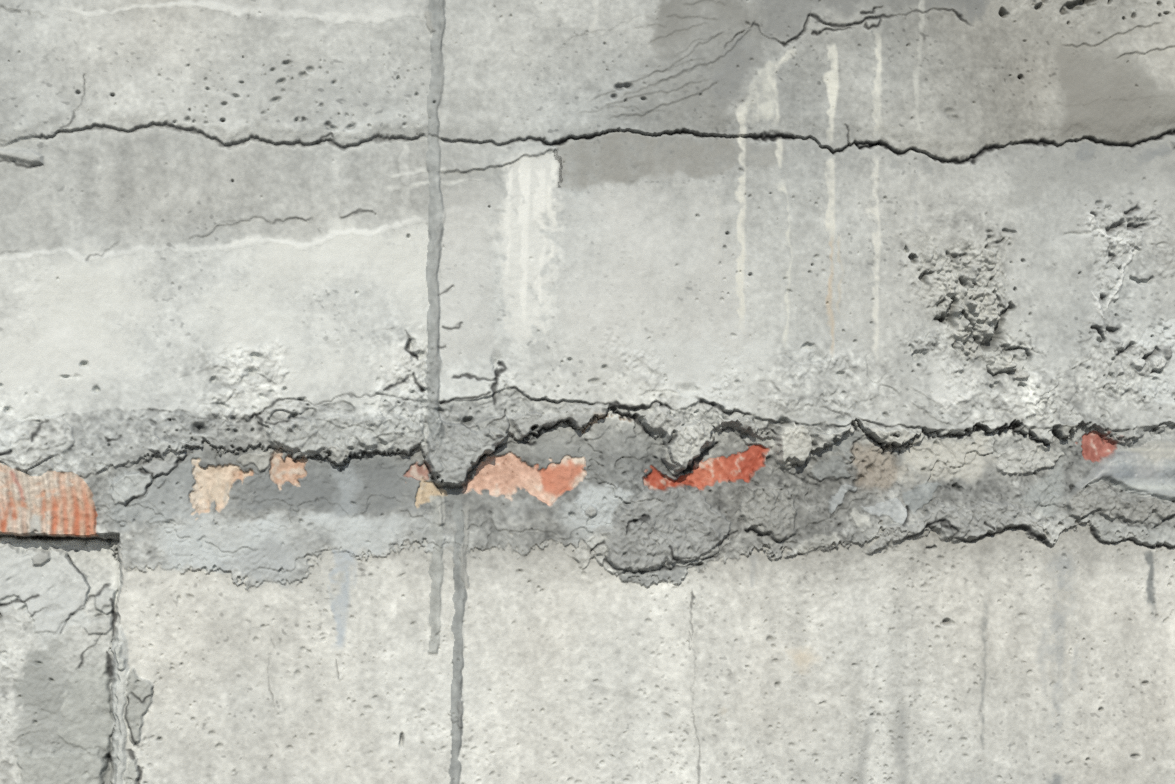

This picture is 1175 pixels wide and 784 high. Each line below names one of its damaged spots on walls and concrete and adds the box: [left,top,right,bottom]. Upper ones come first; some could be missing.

leakage [0,143,486,376]
crack [0,73,1175,169]
leakage [488,30,797,353]
leakage [821,41,845,357]
crack [724,5,975,49]
leakage [870,29,884,139]
leakage [864,153,900,368]
spalling [907,228,1037,388]
spalling [1074,200,1175,405]
crack [0,419,50,456]
crack [0,534,155,784]
crack [124,321,1133,784]